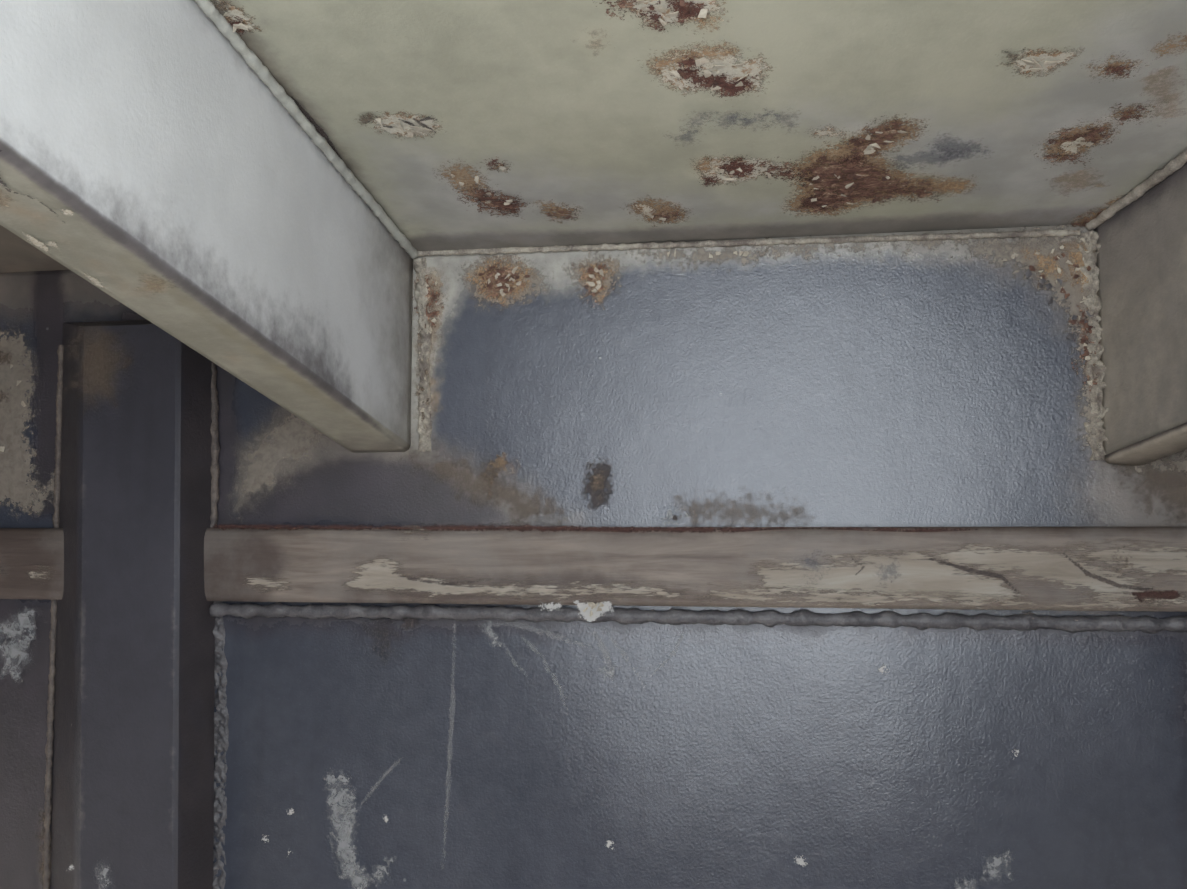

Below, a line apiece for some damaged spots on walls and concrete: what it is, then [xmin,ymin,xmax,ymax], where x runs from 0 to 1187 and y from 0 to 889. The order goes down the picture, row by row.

crack [0,150,55,213]
peeling [359,112,443,138]
rust [434,157,582,223]
rust [694,116,974,216]
rust [1036,103,1155,169]
rust [462,254,548,308]
peeling [0,330,55,516]
water stain [238,413,325,506]
water stain [581,459,614,509]
water stain [686,502,798,524]
peeling [344,559,680,622]
peeling [702,540,1187,611]